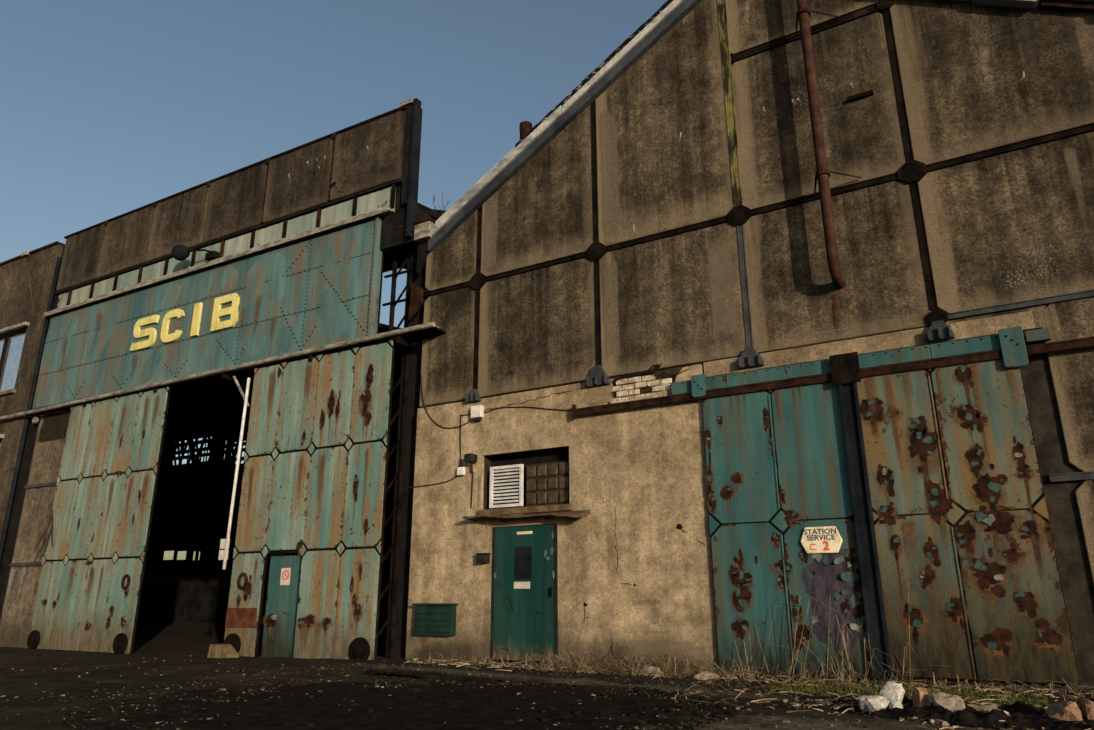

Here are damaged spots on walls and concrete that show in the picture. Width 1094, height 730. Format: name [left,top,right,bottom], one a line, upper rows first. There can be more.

water stain [600,113,619,233]
water stain [1065,150,1079,183]
water stain [484,200,497,268]
water stain [603,262,619,360]
water stain [647,241,737,349]
corrosion [142,397,159,427]
spalling [608,364,681,404]
corrosion [126,476,148,504]
peeling [778,484,799,526]
corrosion [87,568,103,596]
peeling [729,549,758,640]
peeling [771,532,866,653]